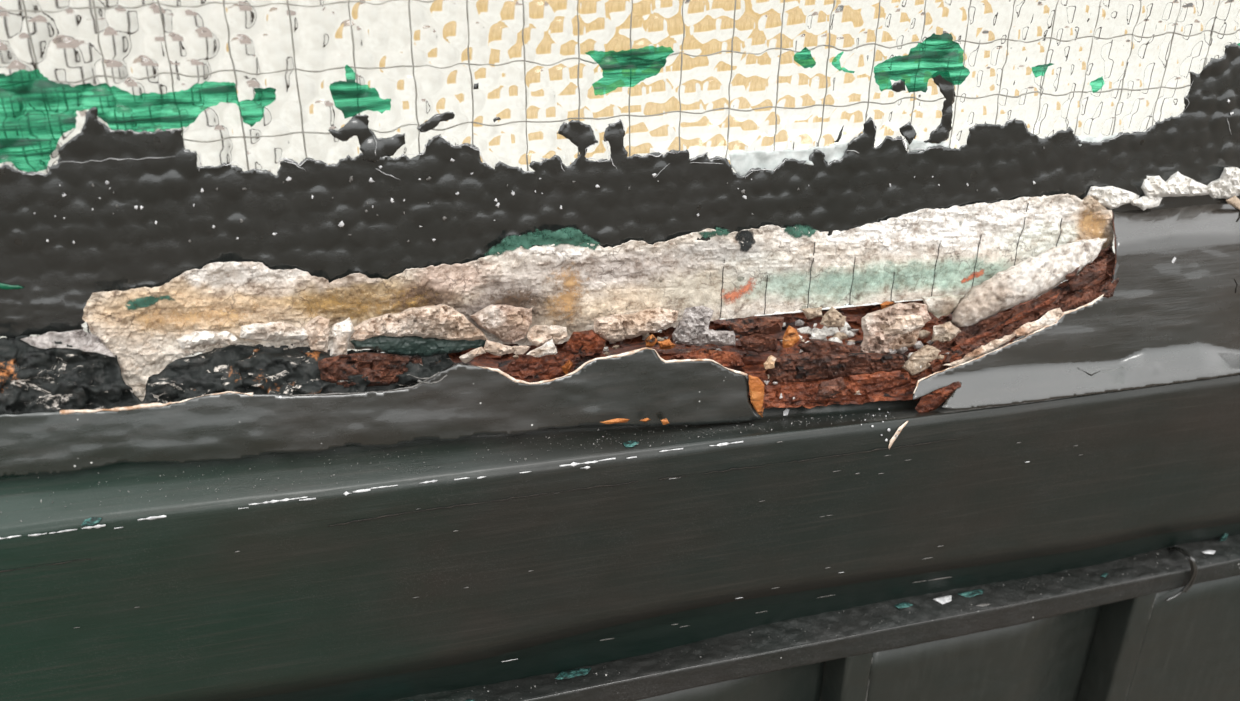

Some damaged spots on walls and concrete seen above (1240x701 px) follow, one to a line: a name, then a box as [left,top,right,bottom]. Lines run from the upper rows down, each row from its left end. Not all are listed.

peeling [0,42,1240,357]
rust [724,280,755,304]
rust [929,210,1119,373]
peeling [0,300,1062,477]
rust [915,381,961,413]
spalling [238,497,316,509]
spalling [0,517,123,539]